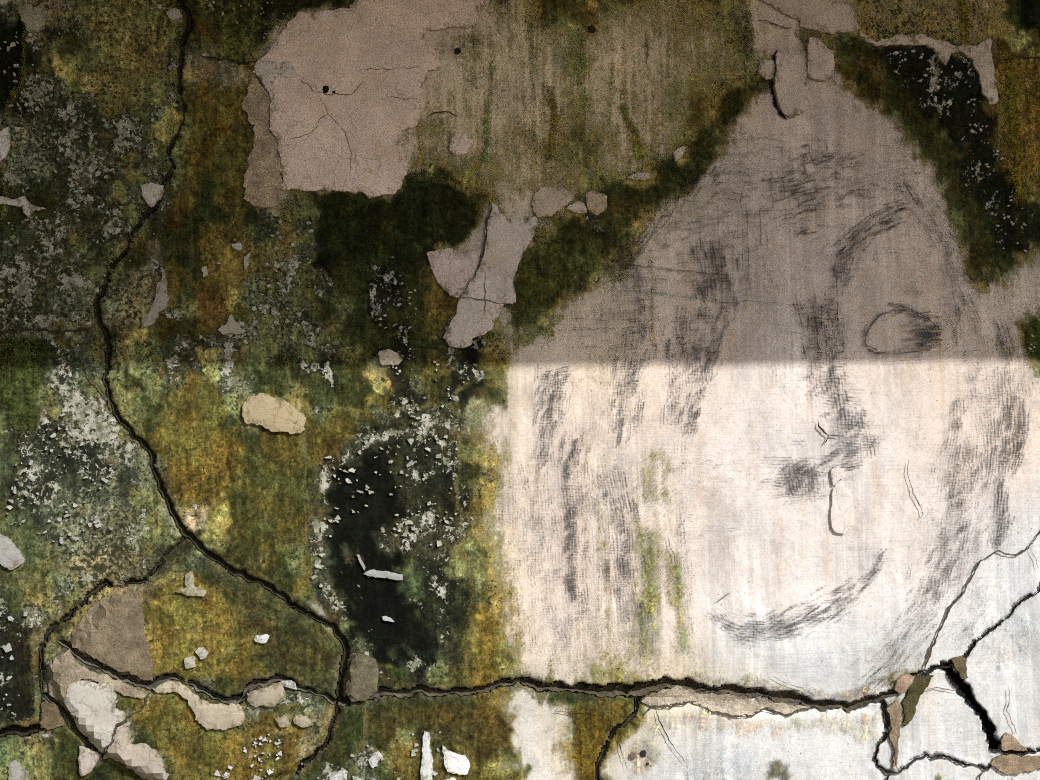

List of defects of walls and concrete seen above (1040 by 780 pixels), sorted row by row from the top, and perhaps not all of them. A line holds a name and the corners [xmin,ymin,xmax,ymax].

crack [162,0,192,186]
crack [287,66,419,173]
peeling [241,0,488,208]
crack [758,20,794,120]
peeling [757,0,999,134]
leakage [848,0,1040,200]
peeling [426,187,607,349]
spalling [40,592,313,780]
peeling [411,731,470,780]
crack [0,200,992,780]
leakage [353,375,881,780]
crack [912,532,1040,756]